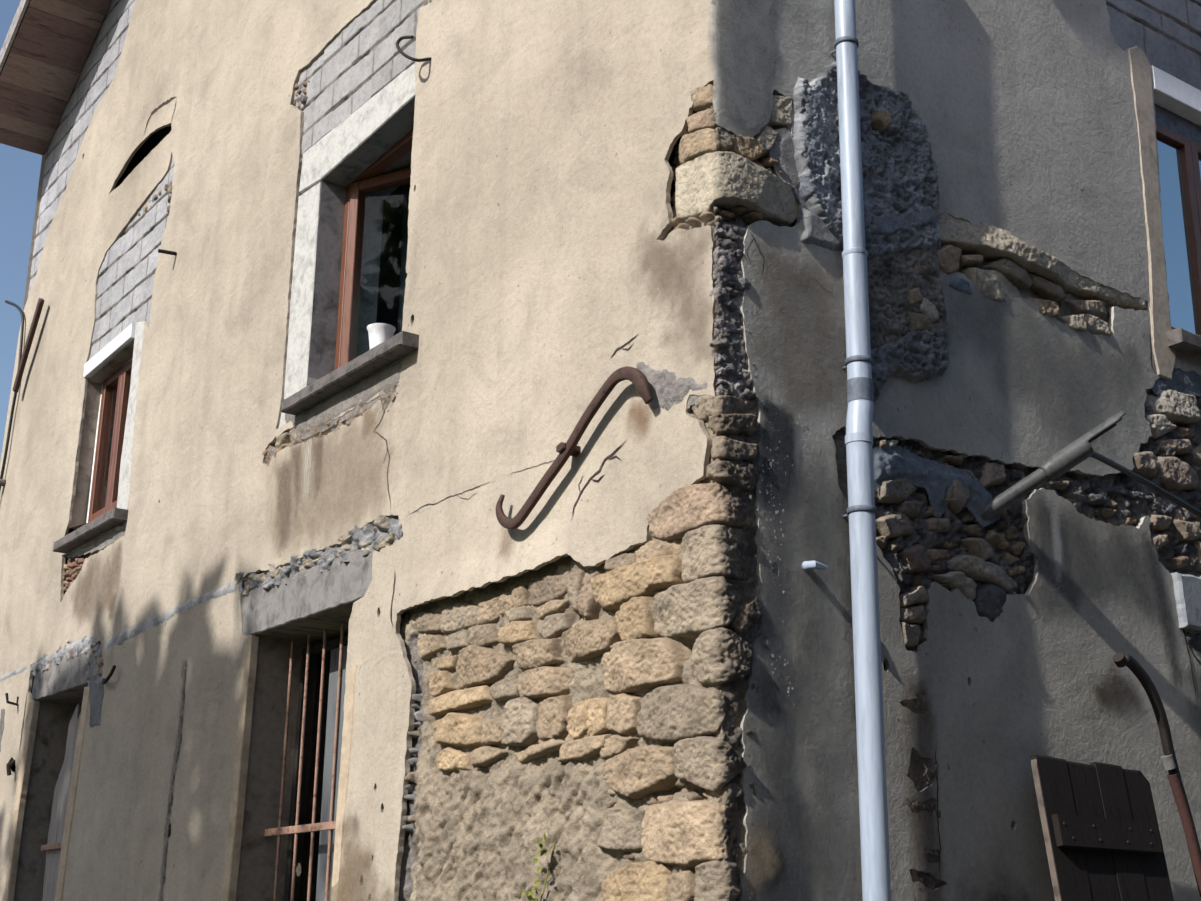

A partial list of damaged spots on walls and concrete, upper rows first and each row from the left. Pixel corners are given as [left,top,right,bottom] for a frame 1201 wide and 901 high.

crack [144,97,177,134]
crack [611,333,639,357]
spalling [709,224,756,399]
flaking render [936,212,1146,337]
spalling [262,359,402,466]
crack [571,437,628,519]
water stain [762,397,794,501]
spalling [234,515,402,595]
water stain [1035,500,1178,680]
spalling [30,636,104,728]